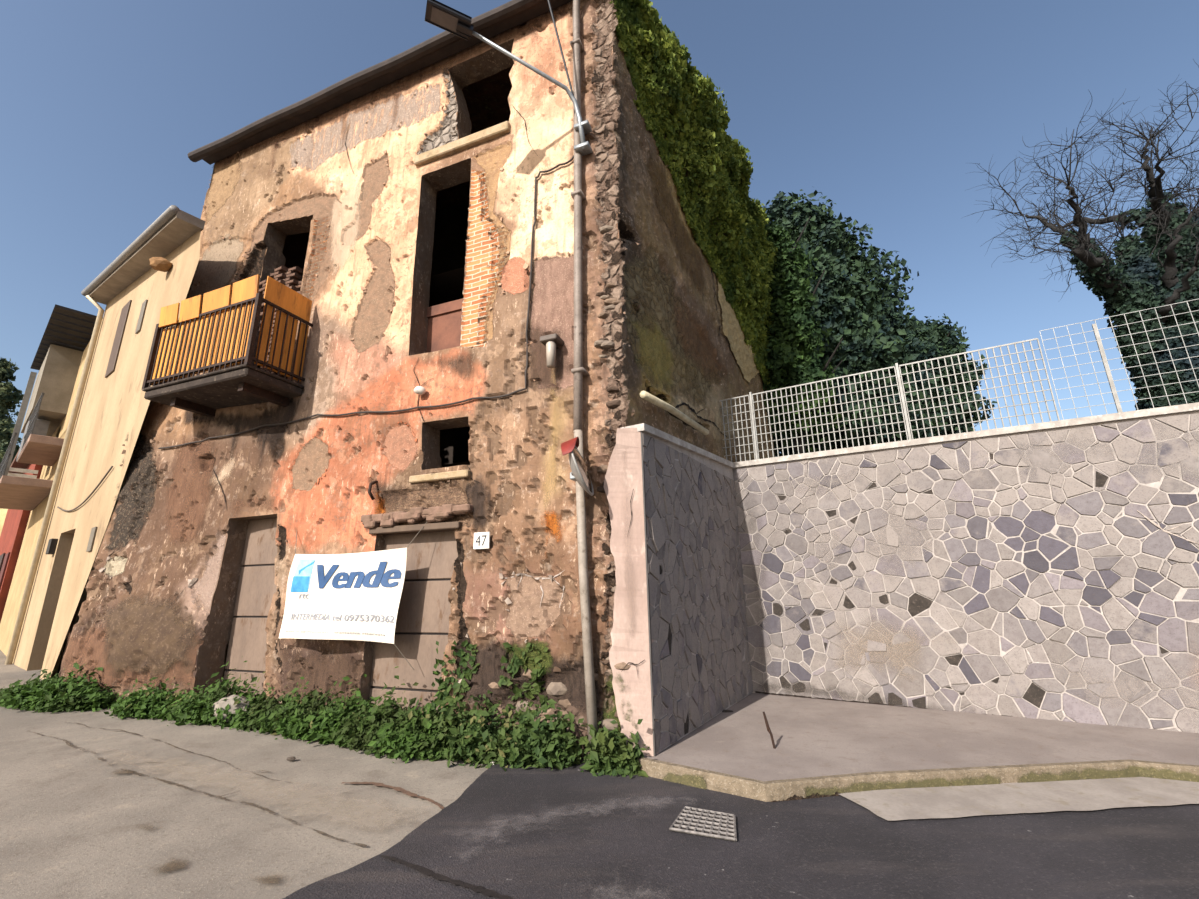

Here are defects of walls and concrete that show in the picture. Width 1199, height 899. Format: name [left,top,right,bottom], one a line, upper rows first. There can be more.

flaking render [188,67,458,353]
flaking render [460,141,574,389]
spalling [591,0,641,731]
flaking render [99,433,158,594]
flaking render [452,537,471,683]